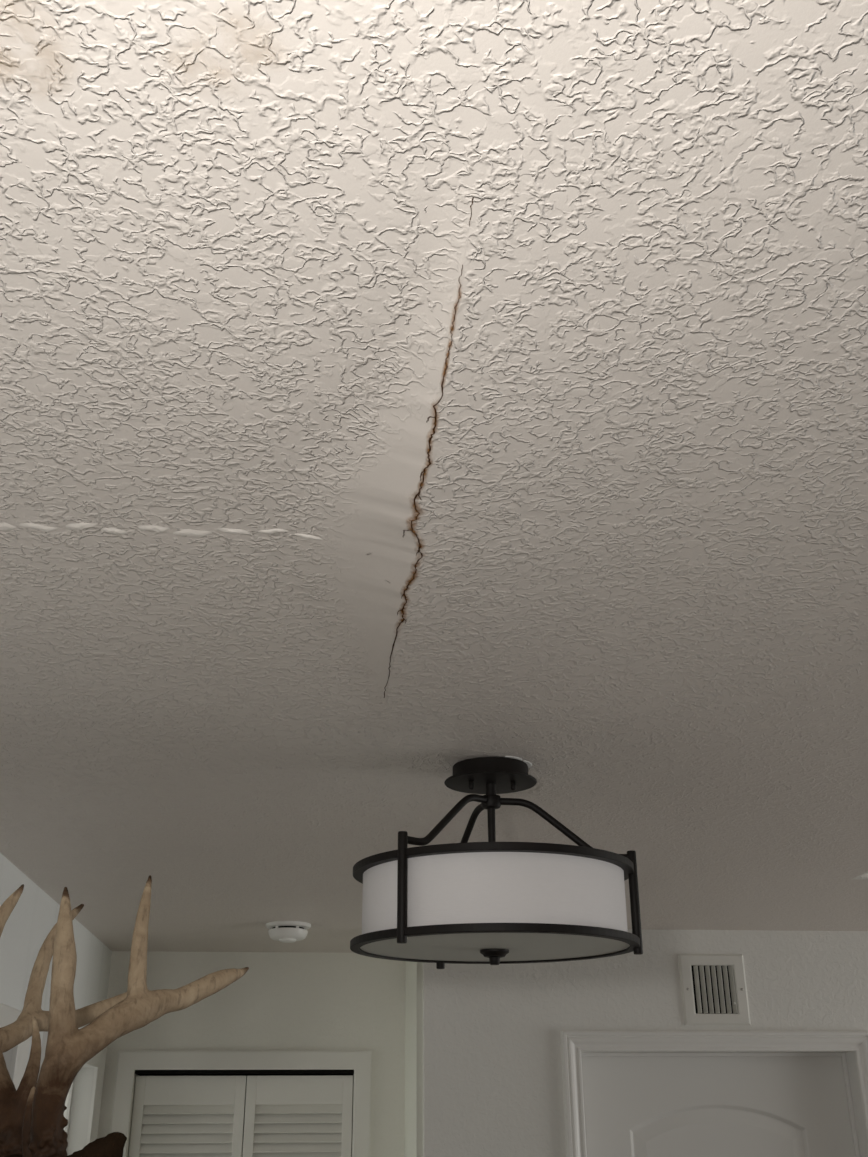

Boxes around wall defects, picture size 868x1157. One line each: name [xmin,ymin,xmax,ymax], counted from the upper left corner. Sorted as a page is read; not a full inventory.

crack [384,265,463,698]